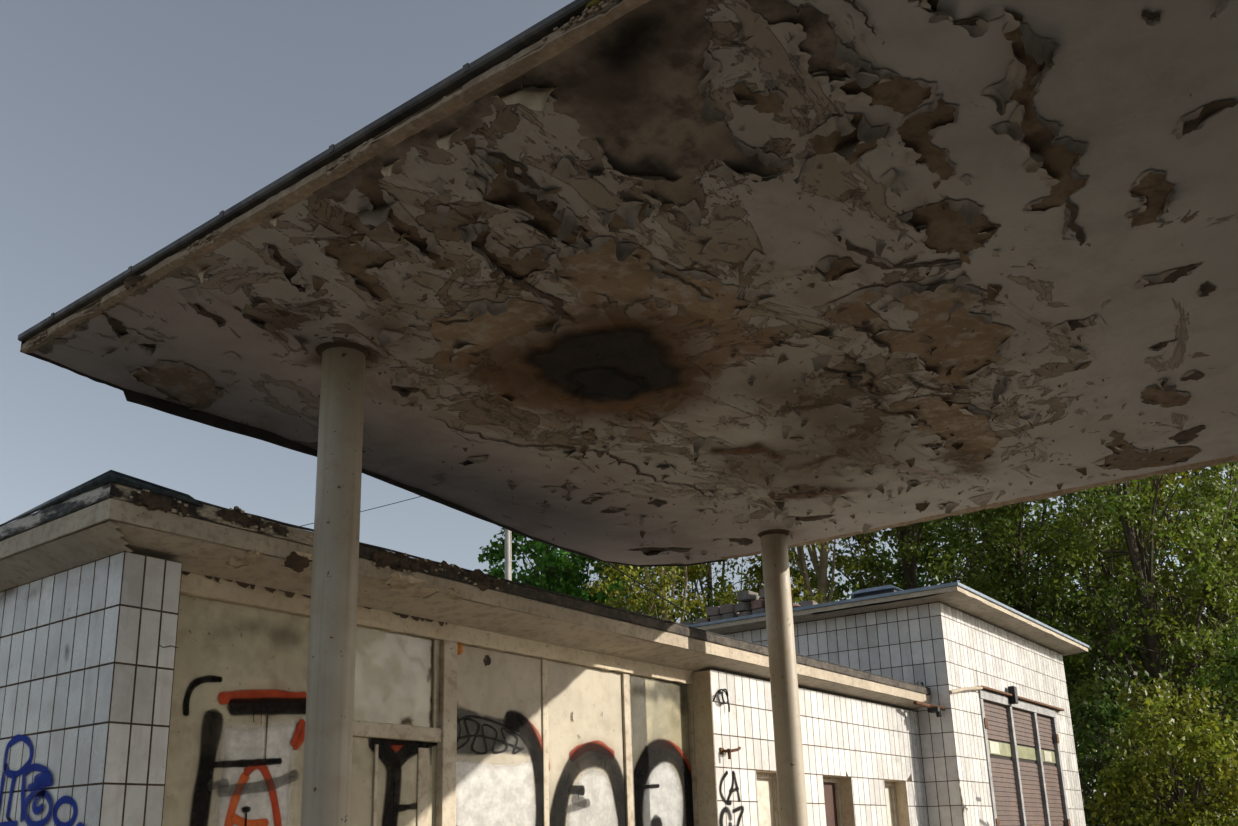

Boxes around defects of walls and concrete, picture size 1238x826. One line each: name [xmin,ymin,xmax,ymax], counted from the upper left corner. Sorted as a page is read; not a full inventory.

peeling [1125,170,1176,228]
peeling [302,0,1107,560]
peeling [25,226,229,410]
damp [526,328,681,403]
peeling [1149,339,1178,351]
peeling [1138,370,1205,425]
peeling [1075,426,1206,481]
spalling [129,489,189,517]
spalling [214,506,291,538]
peeling [283,551,313,573]
spalling [372,550,510,591]